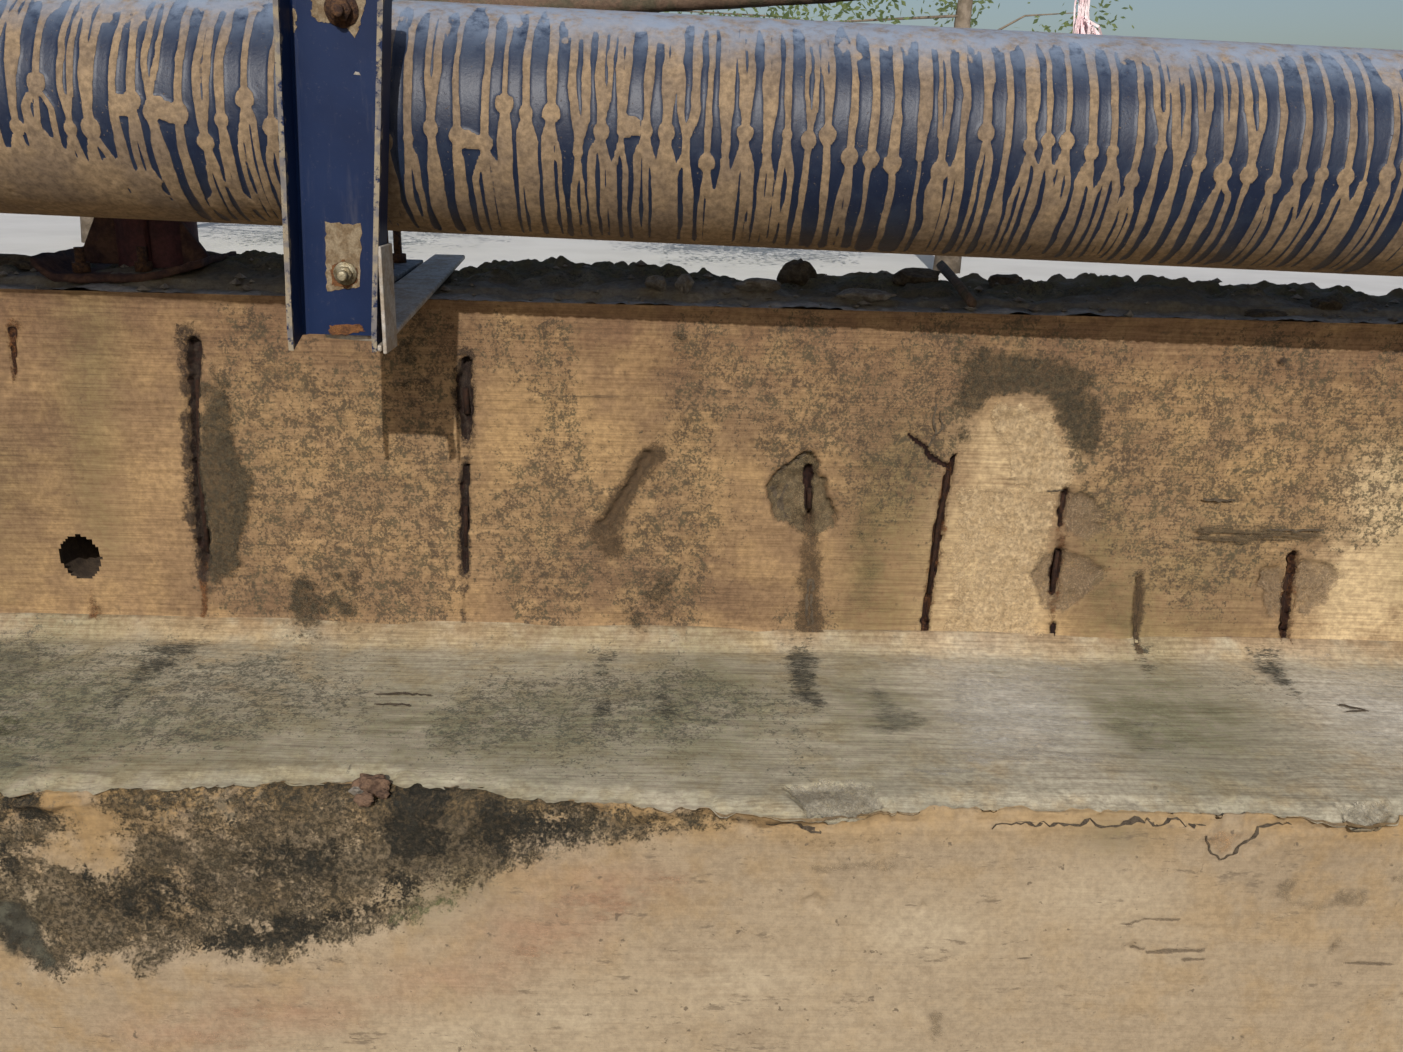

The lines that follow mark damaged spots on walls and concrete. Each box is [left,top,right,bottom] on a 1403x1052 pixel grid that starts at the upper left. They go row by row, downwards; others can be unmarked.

water stain [195,362,254,594]
crack [907,404,947,467]
water stain [952,340,1105,454]